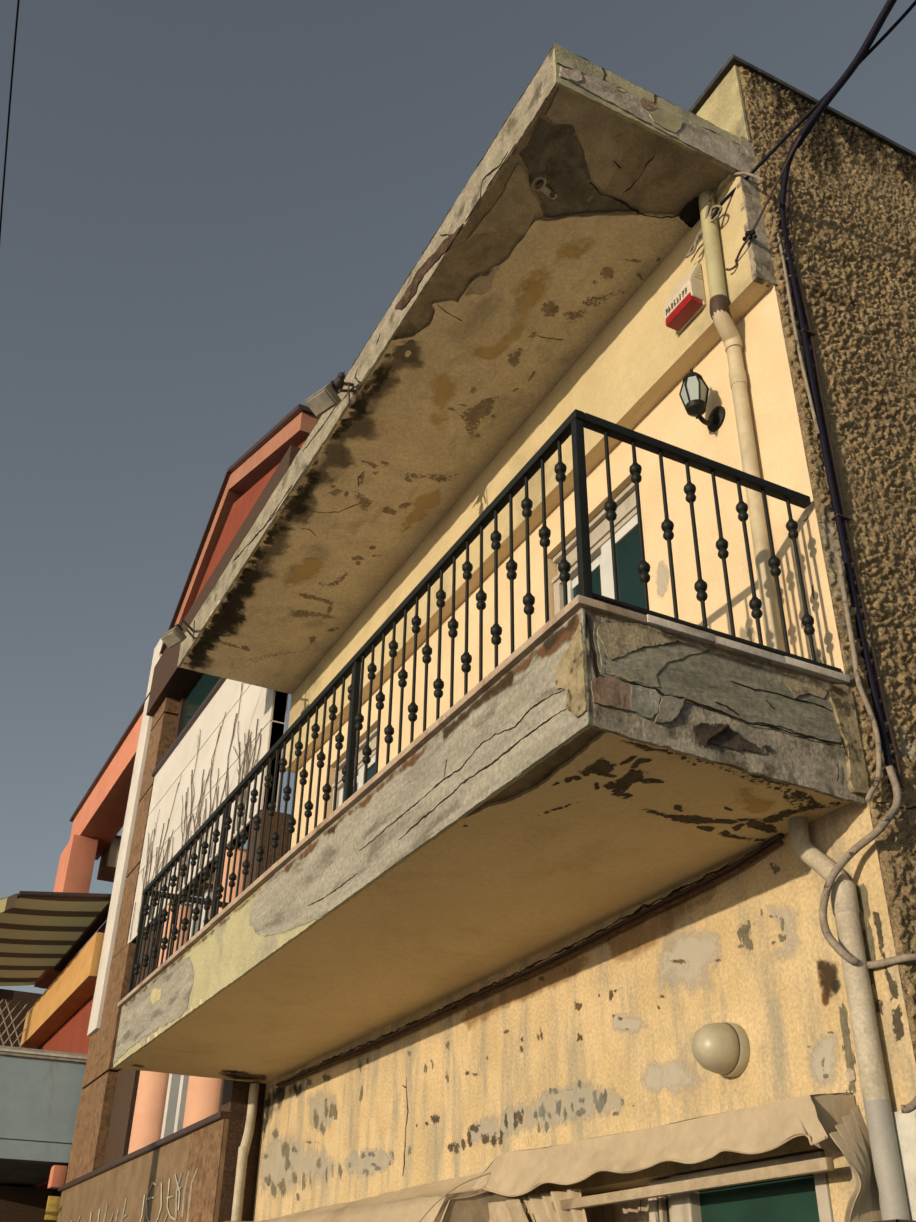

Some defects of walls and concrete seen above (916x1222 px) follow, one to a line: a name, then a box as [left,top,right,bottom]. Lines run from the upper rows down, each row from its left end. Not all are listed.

flaking render [394,67,758,338]
peeling [447,371,536,438]
peeling [508,332,536,368]
damp [184,327,423,670]
crack [308,690,567,906]
flaking render [249,607,869,937]
crack [585,614,848,781]
peeling [598,989,641,1032]
peeling [737,907,798,958]
peeling [856,883,904,1042]
peeling [260,1074,411,1201]
peeling [447,1080,634,1154]